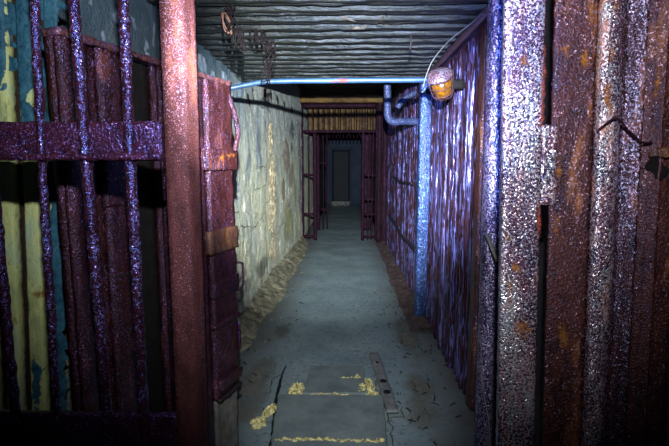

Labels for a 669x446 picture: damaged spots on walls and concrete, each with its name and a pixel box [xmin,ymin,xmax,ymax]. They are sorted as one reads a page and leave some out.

peeling [0,0,35,122]
peeling [40,0,68,122]
peeling [48,161,71,411]
peeling [31,359,45,410]
crack [268,365,286,446]